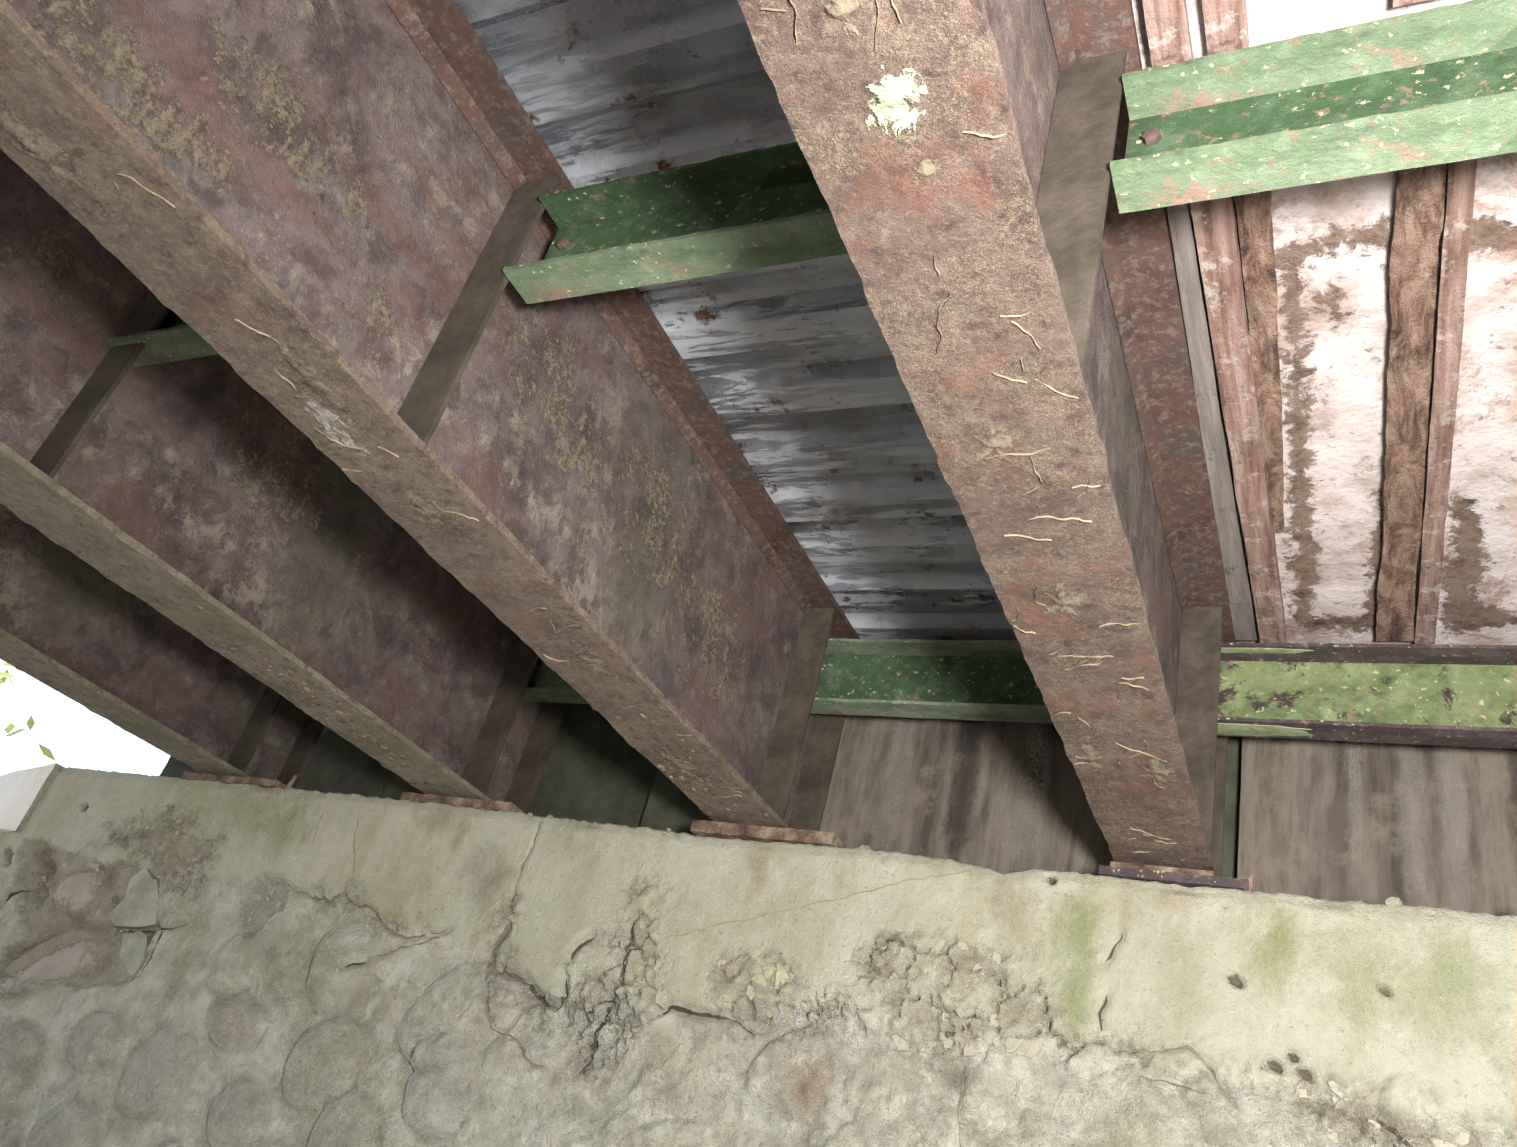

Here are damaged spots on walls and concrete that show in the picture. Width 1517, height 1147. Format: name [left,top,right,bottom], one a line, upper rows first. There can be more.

spalling [0,842,156,995]
crack [484,820,640,1074]
crack [658,1005,755,1036]
flaking render [870,934,1077,1059]
crack [1098,934,1231,1103]
flaking render [1269,1053,1397,1143]
crack [1369,1114,1413,1147]
flaking render [1421,1116,1478,1147]